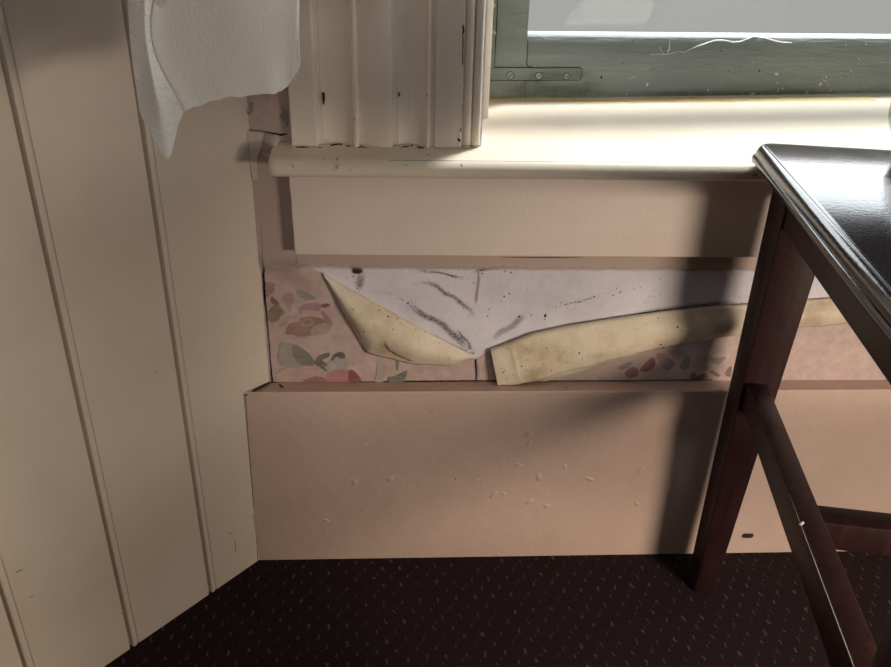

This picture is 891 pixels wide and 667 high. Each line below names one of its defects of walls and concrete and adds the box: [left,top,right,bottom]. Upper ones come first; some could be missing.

flaking render [310,266,755,362]
flaking render [808,276,830,299]